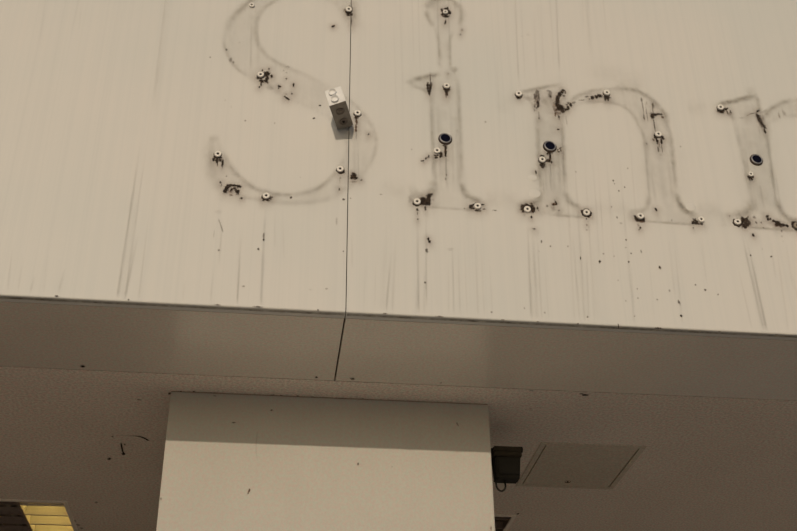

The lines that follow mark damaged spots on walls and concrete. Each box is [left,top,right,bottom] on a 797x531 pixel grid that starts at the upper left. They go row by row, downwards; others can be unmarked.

rust [550,89,572,118]
rust [741,215,796,228]